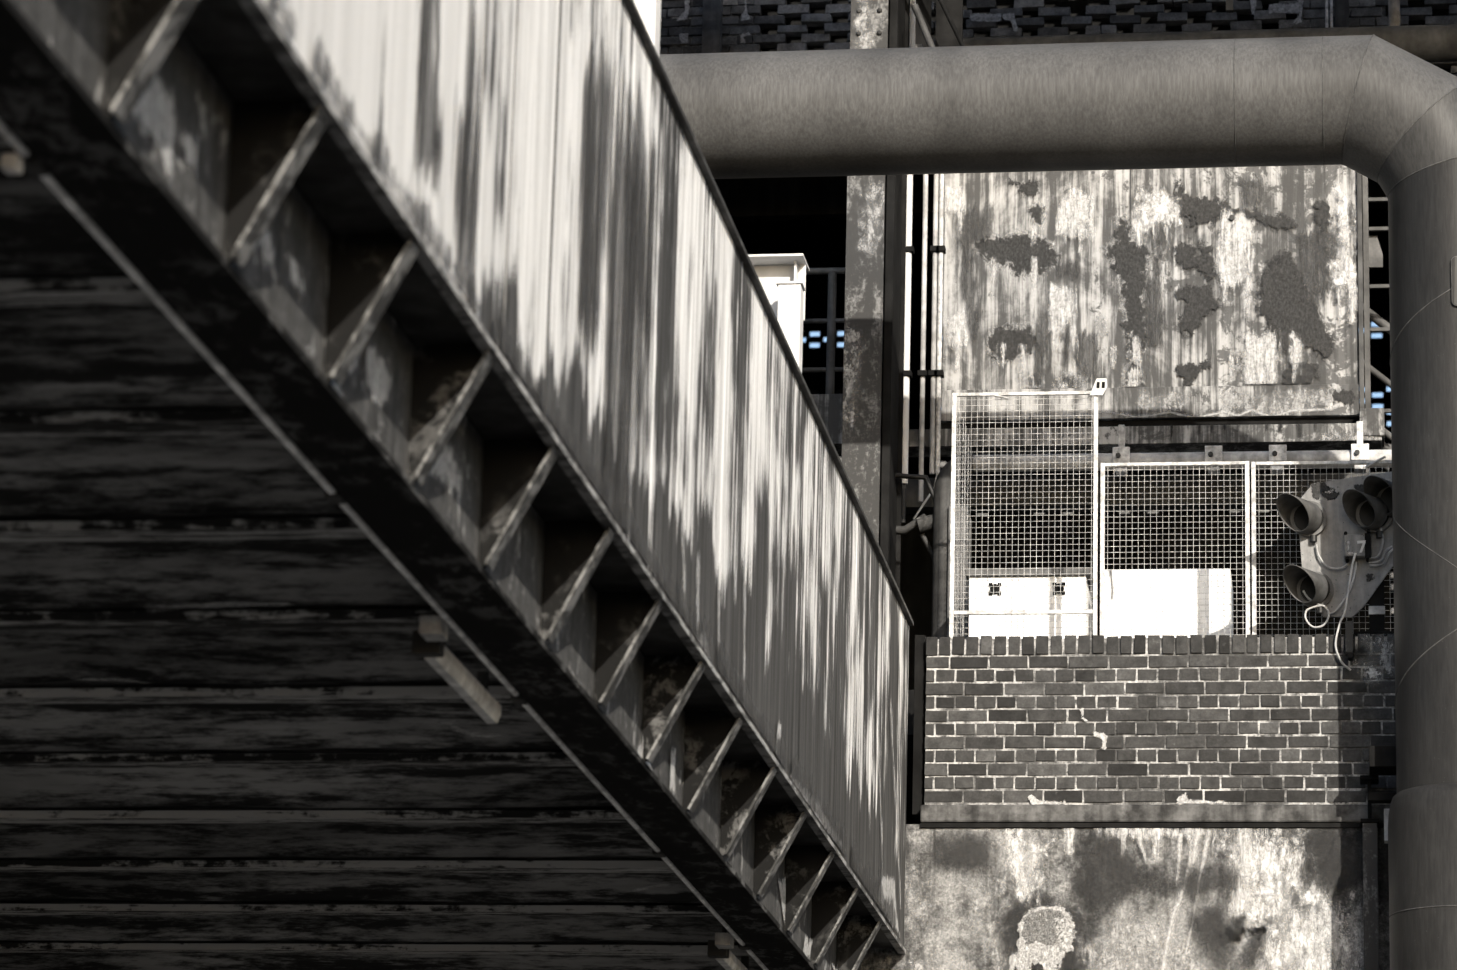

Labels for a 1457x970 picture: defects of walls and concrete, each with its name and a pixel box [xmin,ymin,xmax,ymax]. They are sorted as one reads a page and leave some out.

water stain [414,0,482,308]
peeling [971,178,1080,291]
peeling [986,323,1085,388]
rust [1031,306,1099,384]
rust [1146,224,1167,348]
peeling [1094,178,1357,406]
rust [1238,174,1265,210]
water stain [879,704,1363,970]
spalling [1009,904,1076,970]